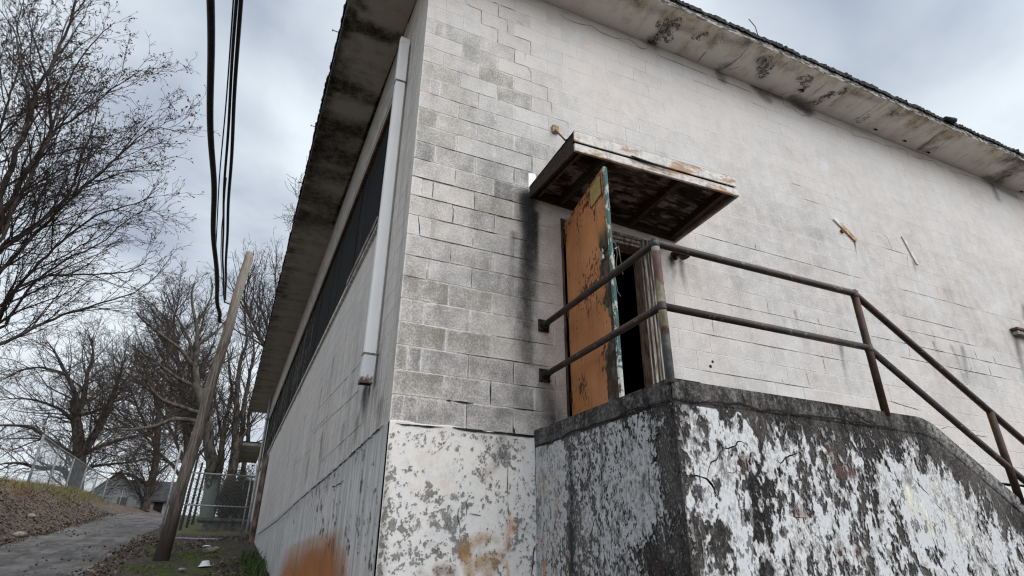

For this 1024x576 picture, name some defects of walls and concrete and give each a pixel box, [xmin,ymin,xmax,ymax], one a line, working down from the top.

damp [296,6,412,226]
crack [471,2,566,122]
damp [520,193,537,342]
crack [259,289,1020,534]
peeling [308,403,1024,576]